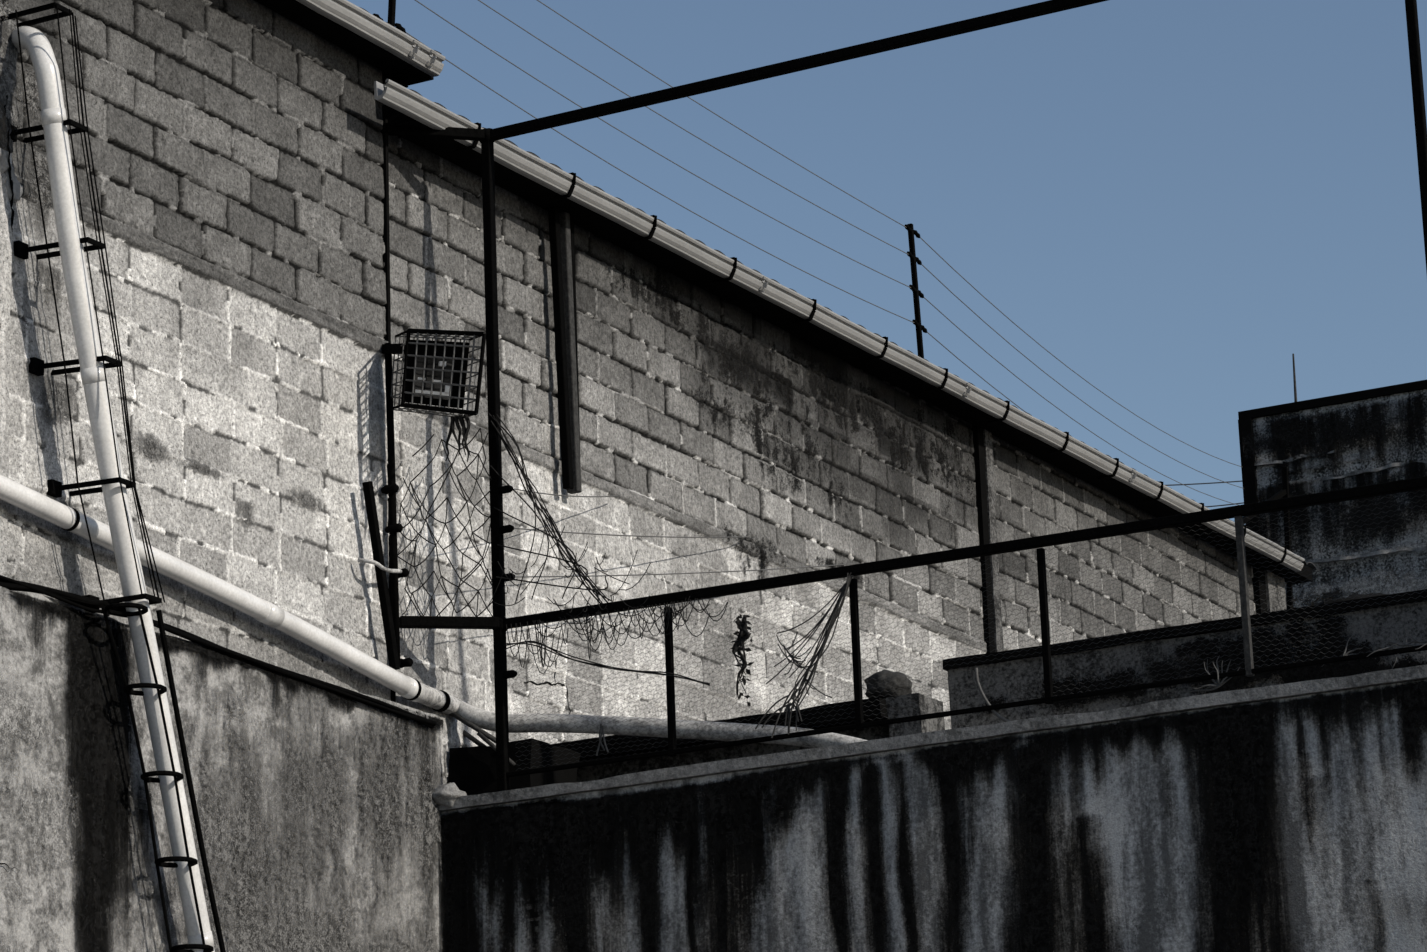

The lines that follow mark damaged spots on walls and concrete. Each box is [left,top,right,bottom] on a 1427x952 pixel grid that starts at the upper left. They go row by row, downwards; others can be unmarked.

water stain [1242,395,1427,553]
water stain [10,591,188,952]
water stain [155,615,1427,952]